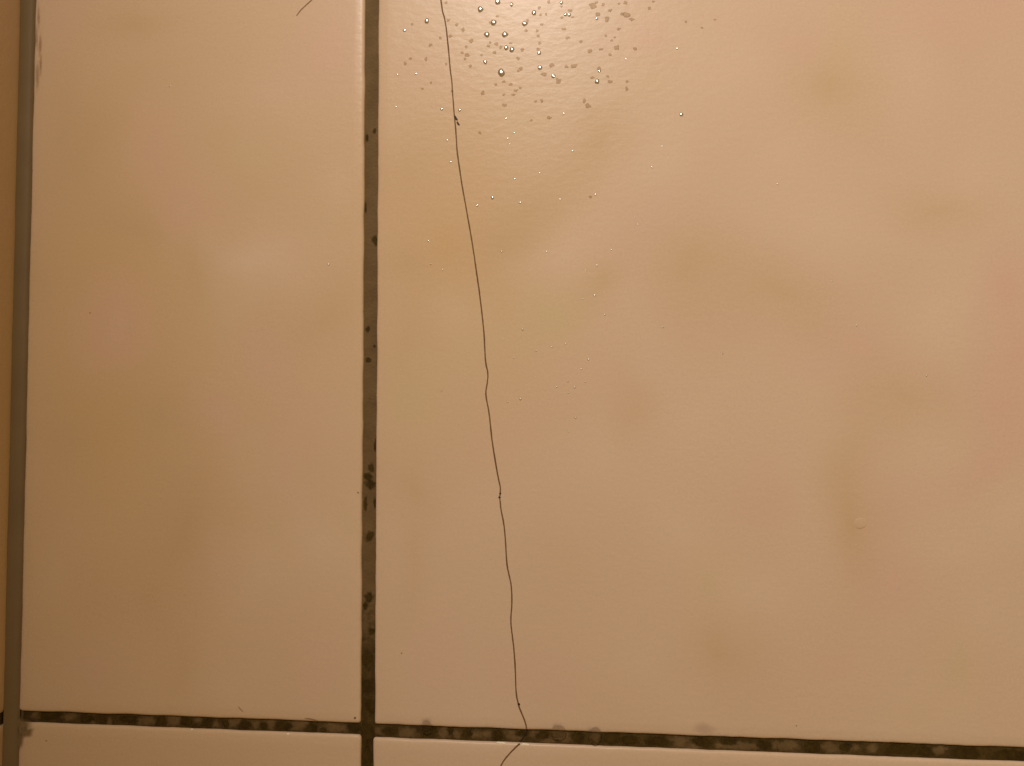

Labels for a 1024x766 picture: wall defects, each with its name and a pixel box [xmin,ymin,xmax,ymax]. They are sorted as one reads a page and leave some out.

crack [440,0,527,766]
water stain [23,629,1024,766]